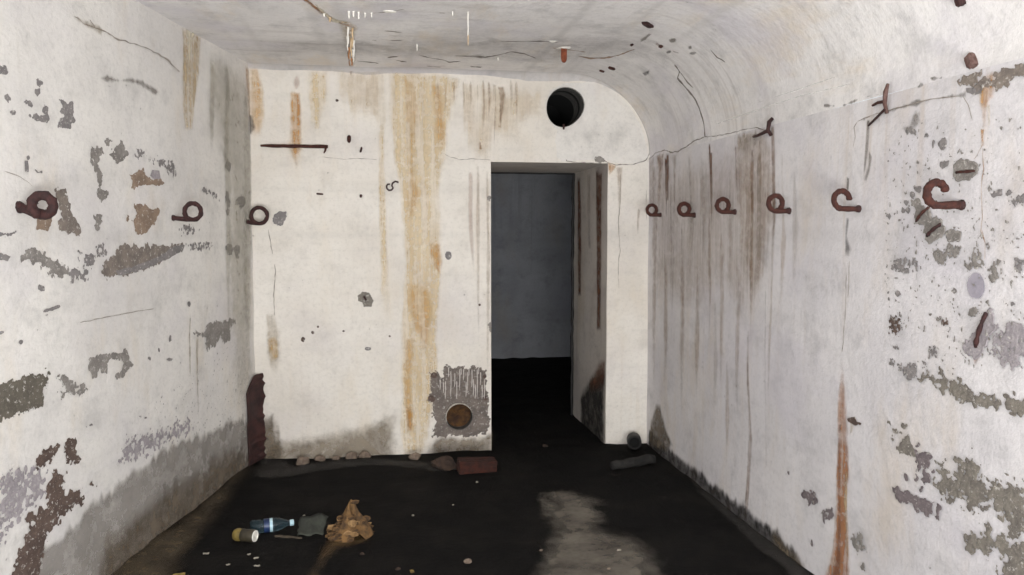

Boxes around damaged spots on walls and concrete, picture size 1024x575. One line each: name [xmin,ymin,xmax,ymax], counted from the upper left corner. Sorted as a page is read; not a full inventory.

crack [824,96,972,146]
peeling [0,203,240,291]
peeling [202,187,246,216]
peeling [885,123,1024,418]
peeling [0,437,97,575]
peeling [0,348,134,423]
leakage [37,420,248,575]
leakage [264,418,390,459]
peeling [427,364,491,438]
leakage [649,407,802,567]
corrosion [828,394,848,575]
peeling [887,421,1024,575]